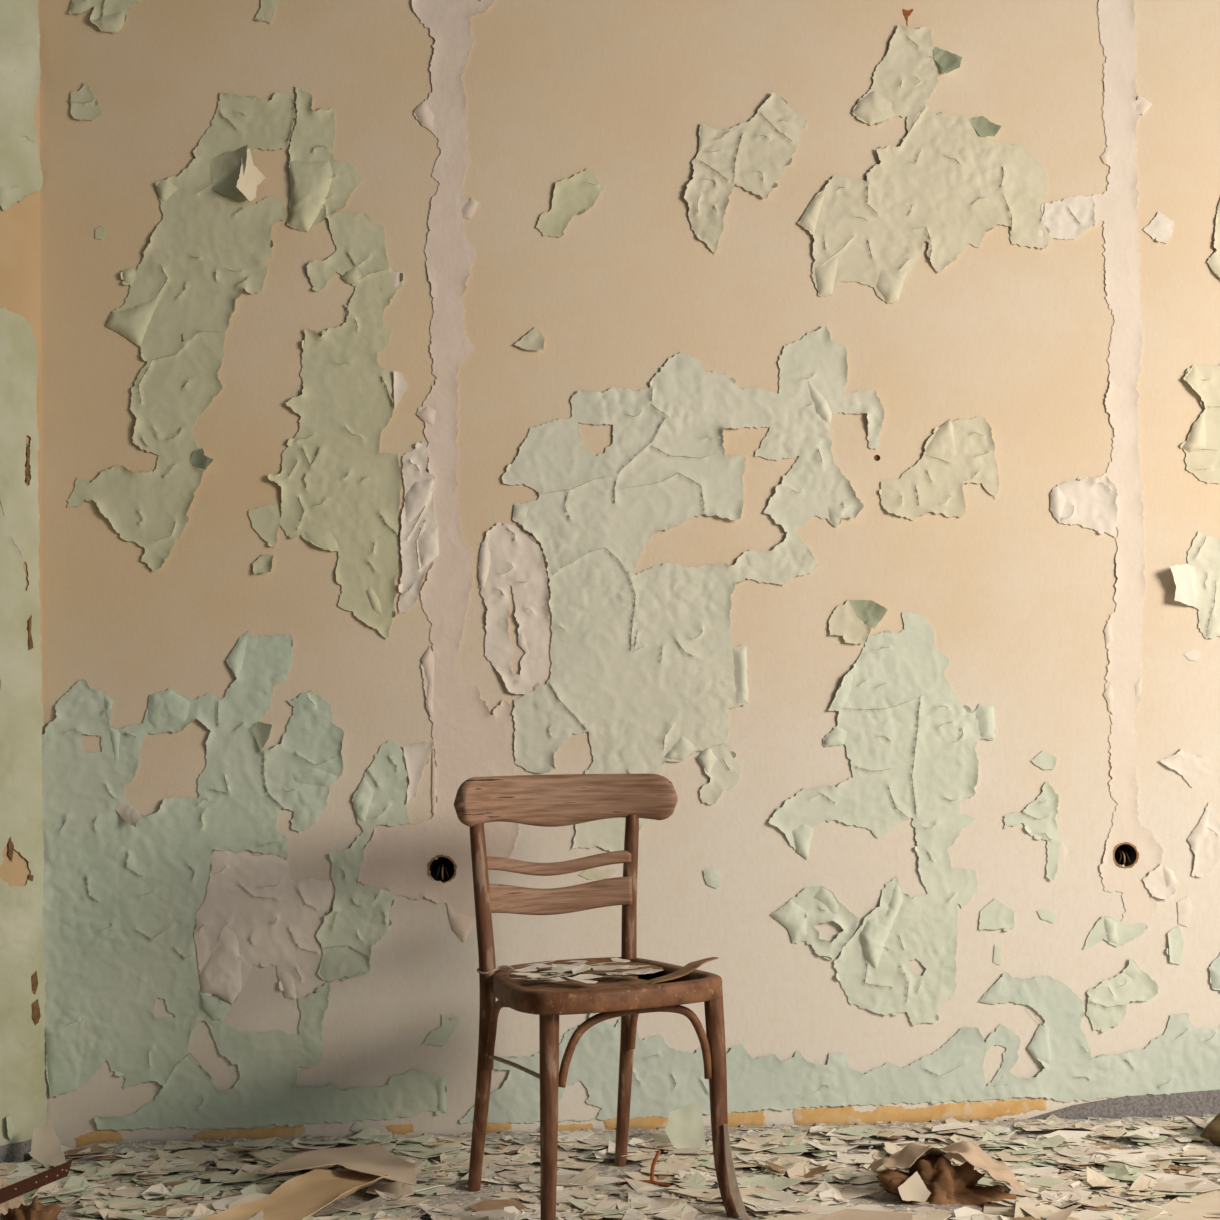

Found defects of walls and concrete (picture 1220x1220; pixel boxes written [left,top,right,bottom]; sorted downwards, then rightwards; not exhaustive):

peeling [0,0,43,211]
peeling [684,92,809,254]
peeling [798,25,1095,304]
peeling [67,82,440,639]
peeling [478,325,884,805]
peeling [1170,531,1220,661]
peeling [0,307,447,1171]
peeling [571,818,648,852]
peeling [769,599,995,1026]
peeling [460,1053,540,1124]
peeling [558,1013,710,1155]
peeling [726,945,1220,1114]